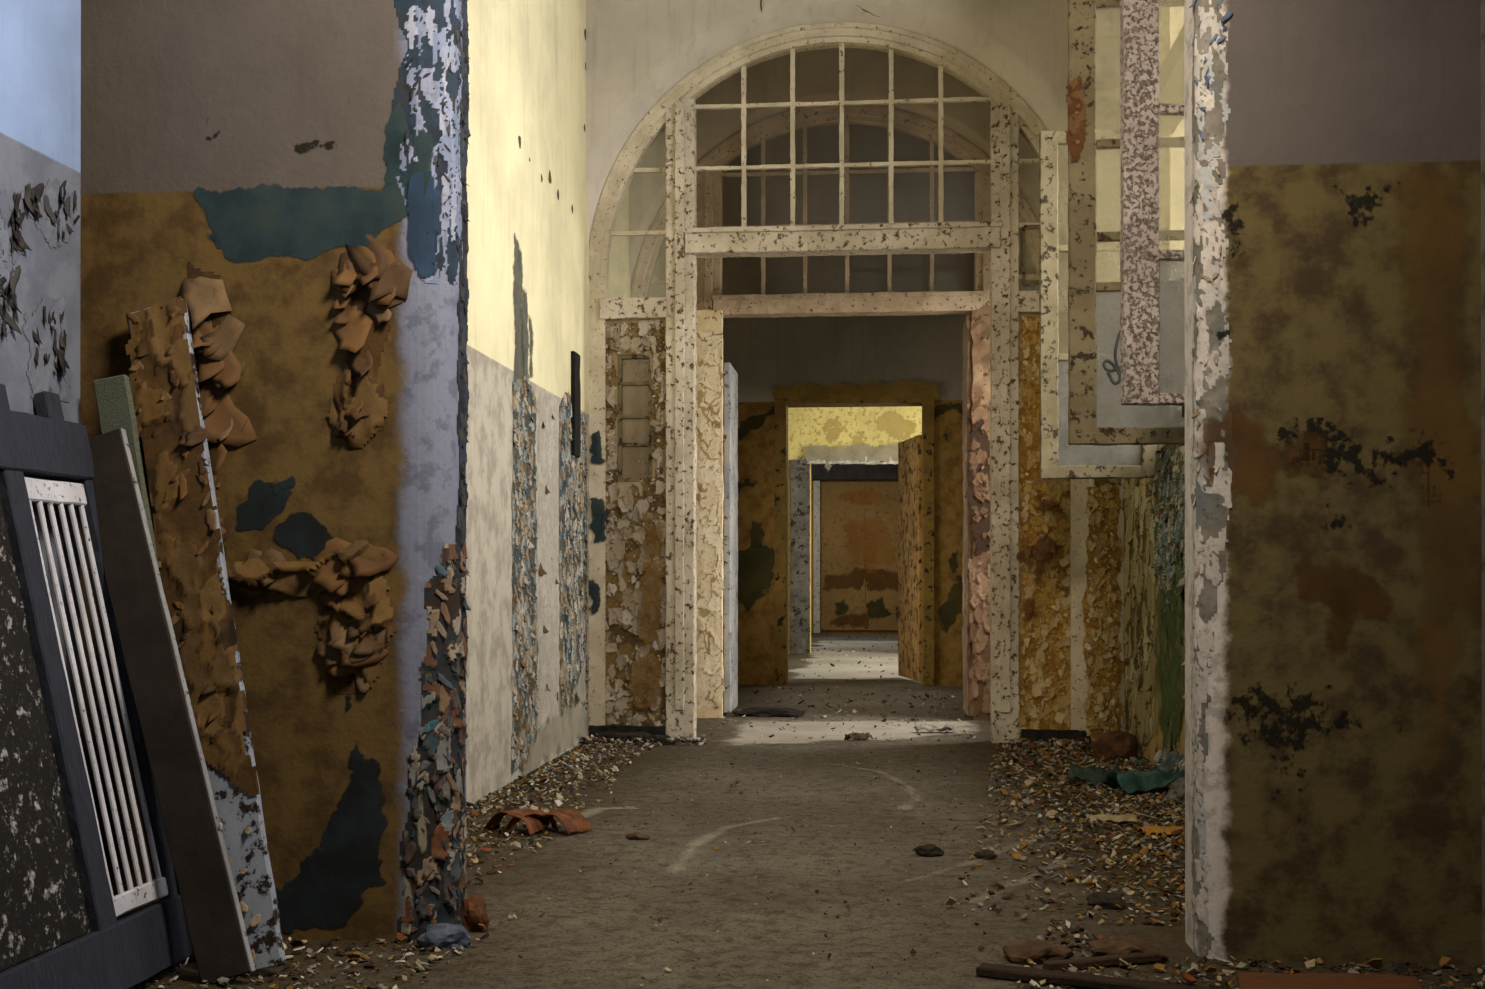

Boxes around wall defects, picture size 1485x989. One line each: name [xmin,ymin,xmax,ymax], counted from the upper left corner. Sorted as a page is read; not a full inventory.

peeling [0,178,80,402]
peeling [315,0,471,942]
peeling [511,319,666,775]
peeling [966,543,991,716]
peeling [1018,0,1233,957]